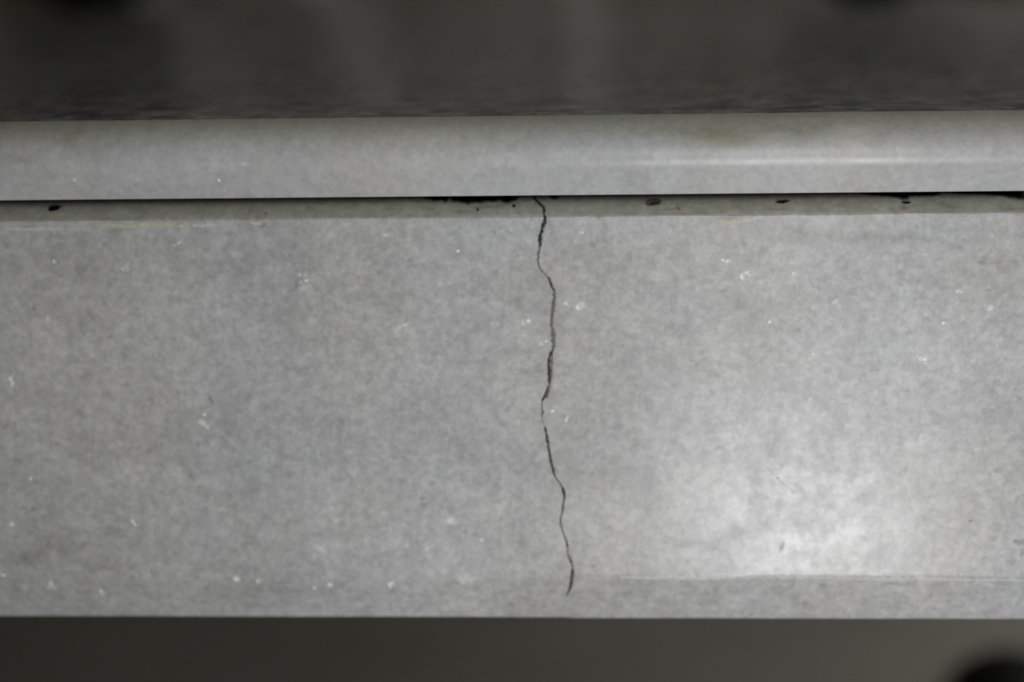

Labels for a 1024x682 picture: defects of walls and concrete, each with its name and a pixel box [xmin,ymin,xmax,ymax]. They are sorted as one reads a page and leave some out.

crack [533,196,574,596]